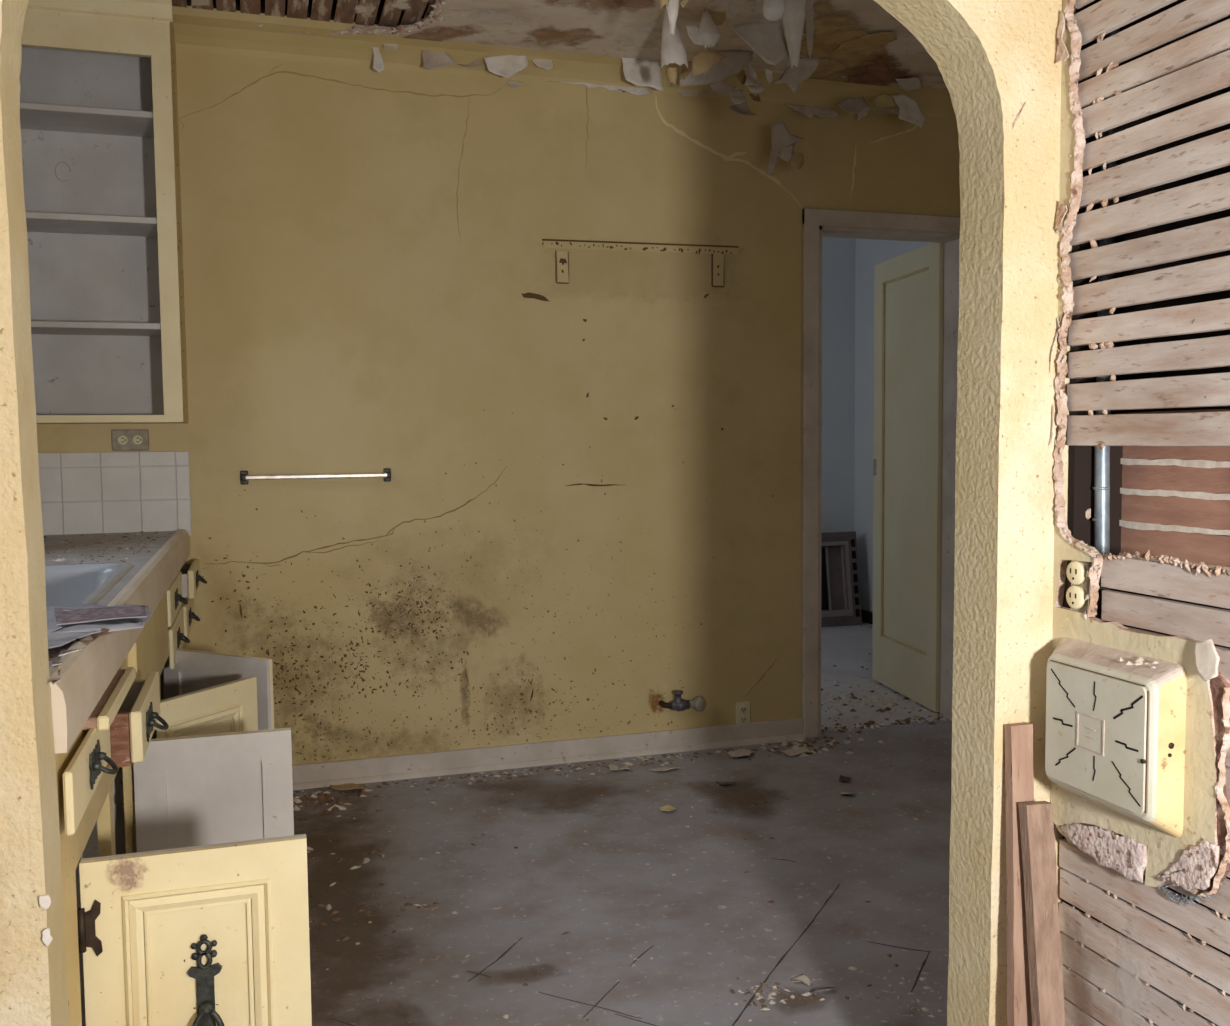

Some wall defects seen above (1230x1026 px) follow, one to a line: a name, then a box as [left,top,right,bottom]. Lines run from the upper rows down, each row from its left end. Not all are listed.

flaking render [172,0,447,72]
leakage [405,27,477,41]
peeling [422,50,699,97]
leakage [528,27,600,45]
peeling [686,0,819,94]
crack [178,64,505,236]
crack [655,96,803,208]
crack [221,466,507,567]
crack [566,480,617,488]
flaking render [1050,0,1230,1026]
leakage [202,517,678,761]